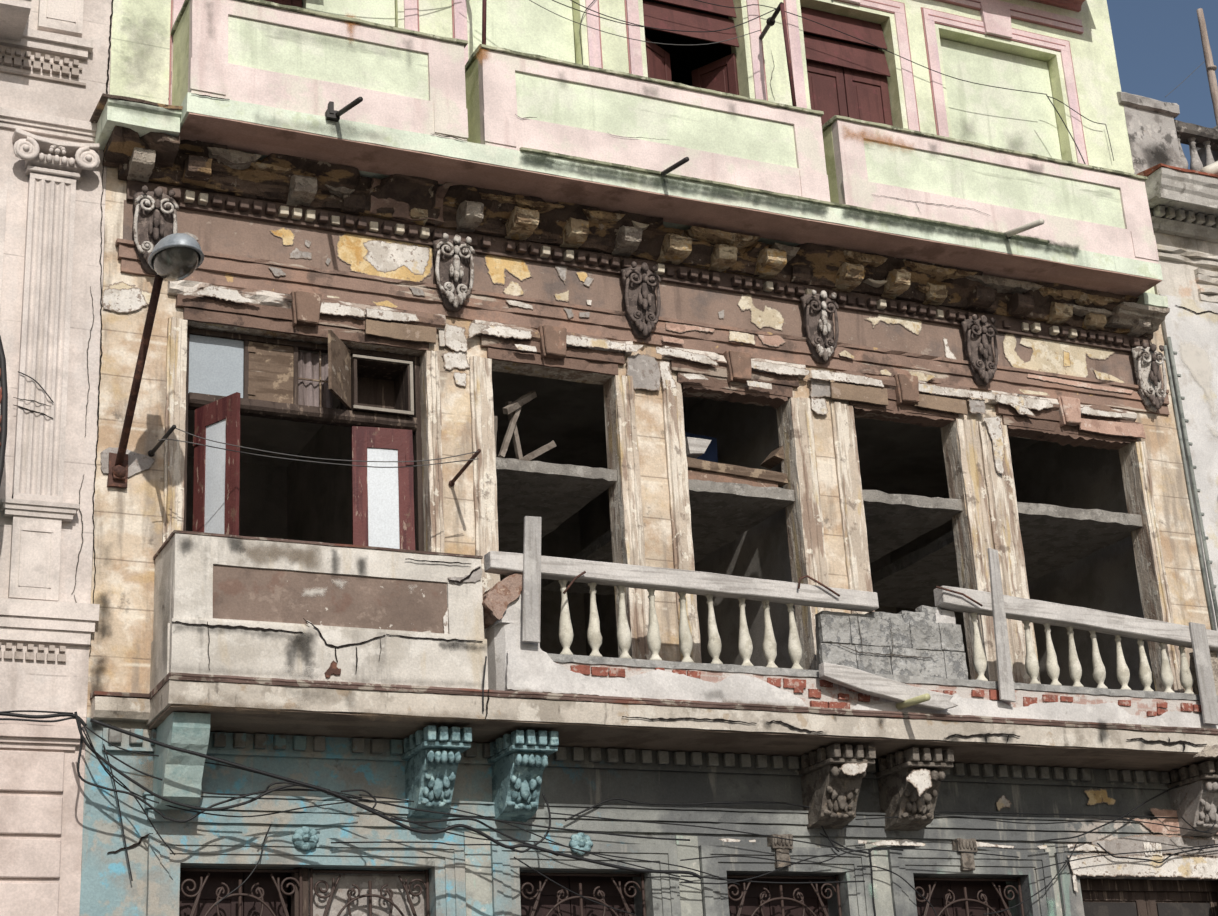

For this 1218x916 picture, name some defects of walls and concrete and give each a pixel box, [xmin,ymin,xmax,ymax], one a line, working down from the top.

crack [105,0,113,94]
leakage [1147,148,1168,166]
peeling [484,255,534,309]
peeling [320,295,537,387]
crack [13,397,53,419]
crack [71,150,104,604]
peeling [566,294,1146,474]
leakage [288,634,312,662]
crack [172,618,483,672]
flaking render [570,665,626,678]
flaking render [767,677,870,709]
peeling [906,769,932,796]